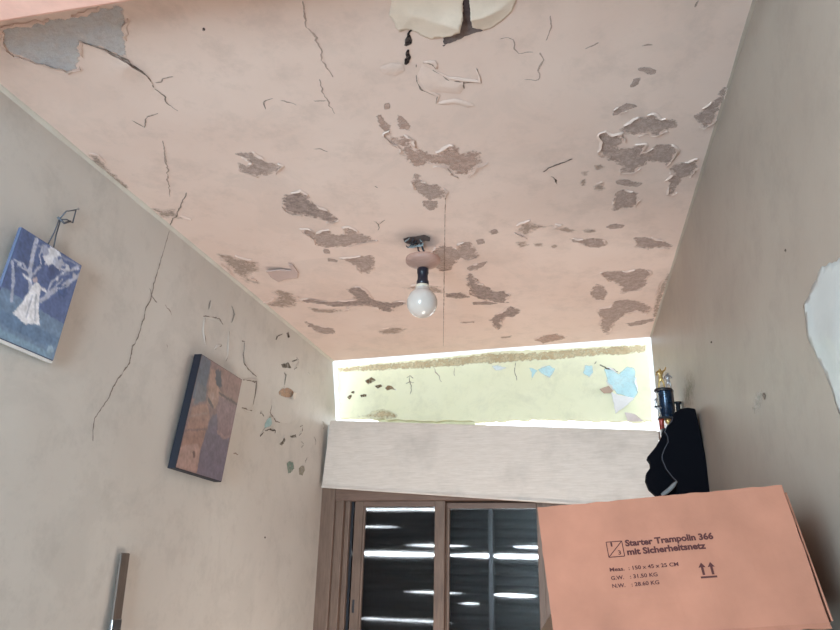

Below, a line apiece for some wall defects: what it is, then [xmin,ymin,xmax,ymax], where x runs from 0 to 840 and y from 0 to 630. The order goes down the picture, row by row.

peeling [0,7,153,92]
crack [82,42,178,127]
crack [302,2,334,112]
crack [501,16,552,81]
peeling [378,103,488,210]
peeling [596,104,698,211]
peeling [282,189,378,274]
crack [93,141,187,429]
peeling [410,239,519,338]
damp [338,345,645,372]
peeling [591,269,669,335]
flaking render [803,257,840,414]